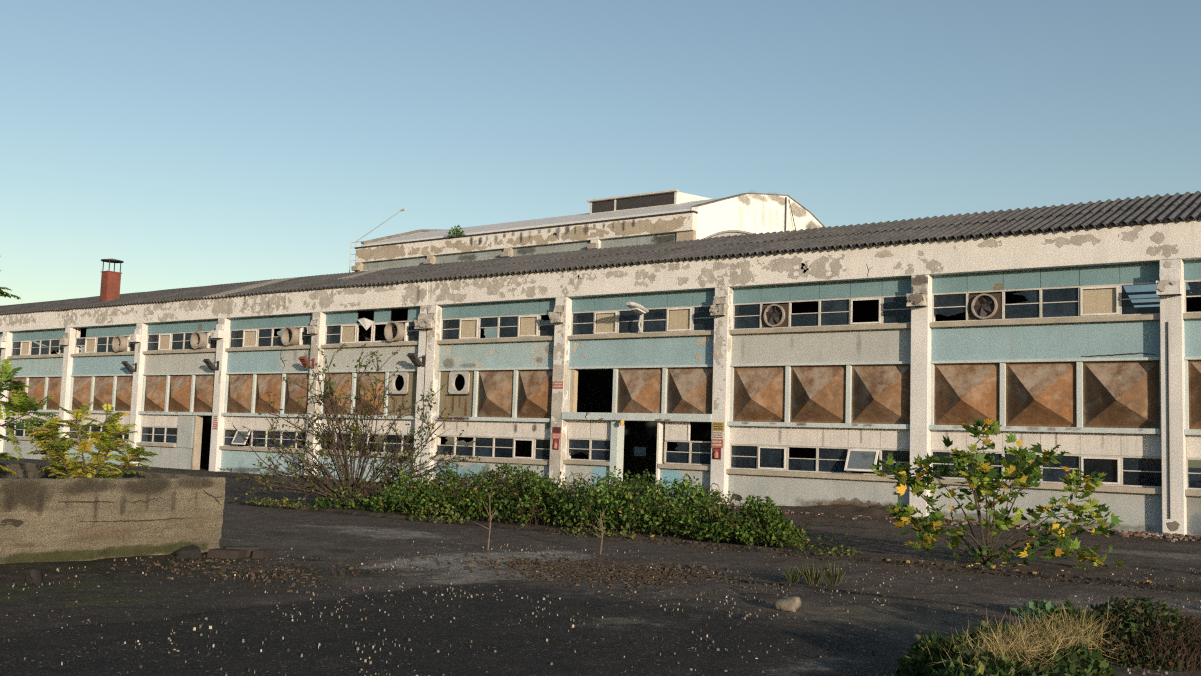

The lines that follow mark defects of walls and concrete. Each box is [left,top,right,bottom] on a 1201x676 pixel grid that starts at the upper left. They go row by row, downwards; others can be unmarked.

peeling [356,216,690,261]
peeling [874,250,944,304]
peeling [1042,233,1101,248]
peeling [1118,224,1179,292]
peeling [529,324,586,487]
leakage [0,470,107,509]
leakage [124,474,167,493]